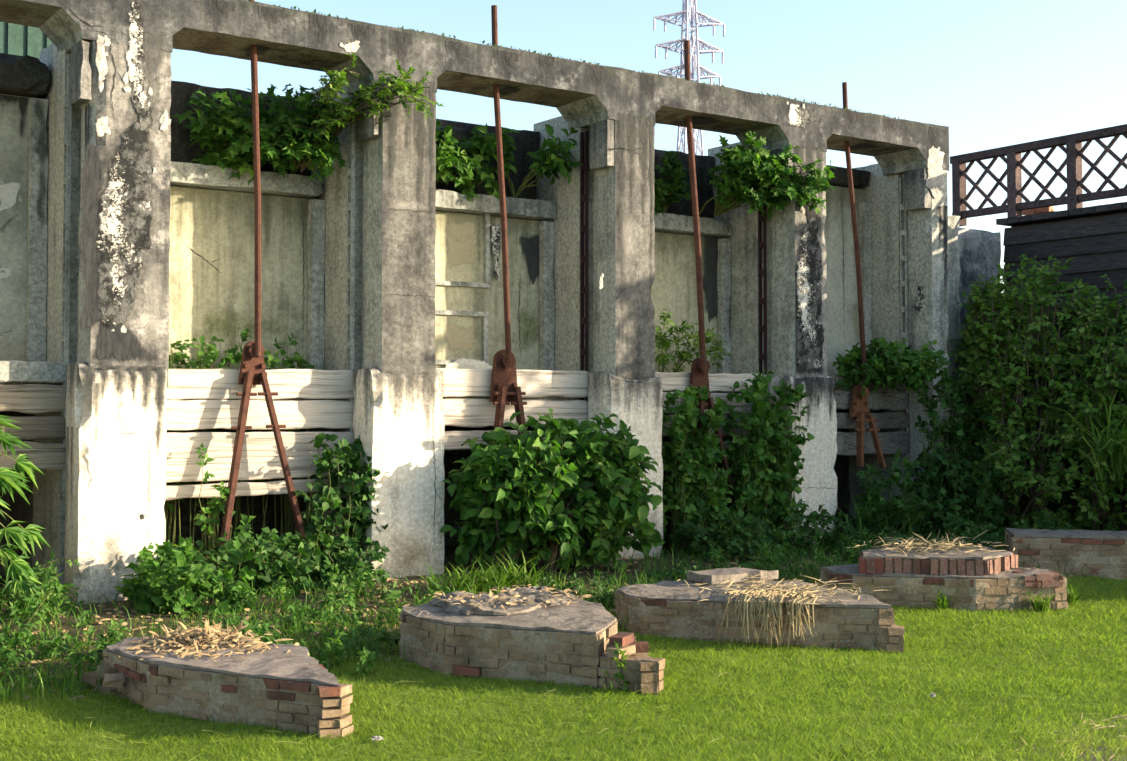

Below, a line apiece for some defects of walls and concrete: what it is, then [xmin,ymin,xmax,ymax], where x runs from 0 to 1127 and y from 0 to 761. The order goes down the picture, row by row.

peeling [0,182,22,211]
leakage [78,104,166,448]
leakage [519,235,539,283]